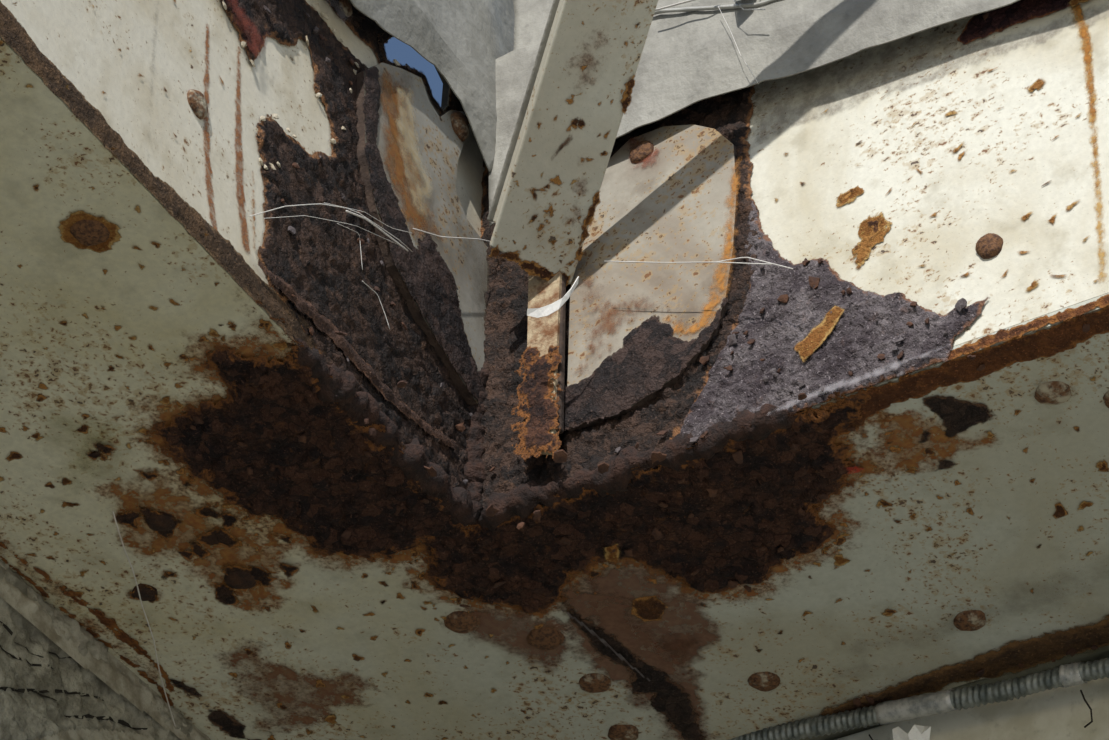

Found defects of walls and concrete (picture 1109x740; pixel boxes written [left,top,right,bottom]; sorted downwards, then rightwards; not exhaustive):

corrosion [1027,79,1045,92]
corrosion [0,1,315,387]
peeling [221,0,472,491]
corrosion [488,173,600,286]
corrosion [836,186,864,207]
corrosion [852,212,892,269]
corrosion [1071,4,1109,283]
peeling [656,201,990,443]
corrosion [96,294,1109,667]
peeling [873,395,997,474]
crack [0,621,148,730]
corrosion [821,615,1109,716]